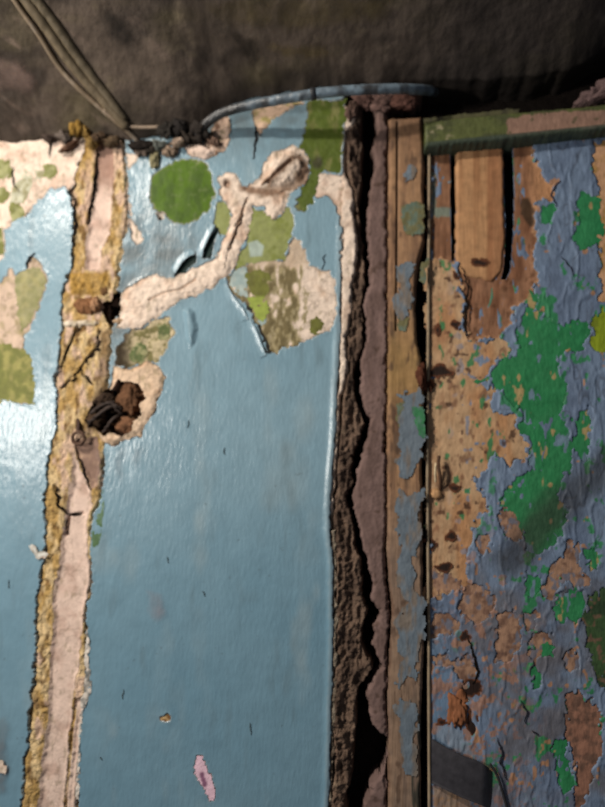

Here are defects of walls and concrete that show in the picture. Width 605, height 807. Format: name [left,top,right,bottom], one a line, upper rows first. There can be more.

crack [59,328,101,389]
flaking render [0,94,420,807]
peeling [392,140,605,777]
peeling [550,689,603,807]